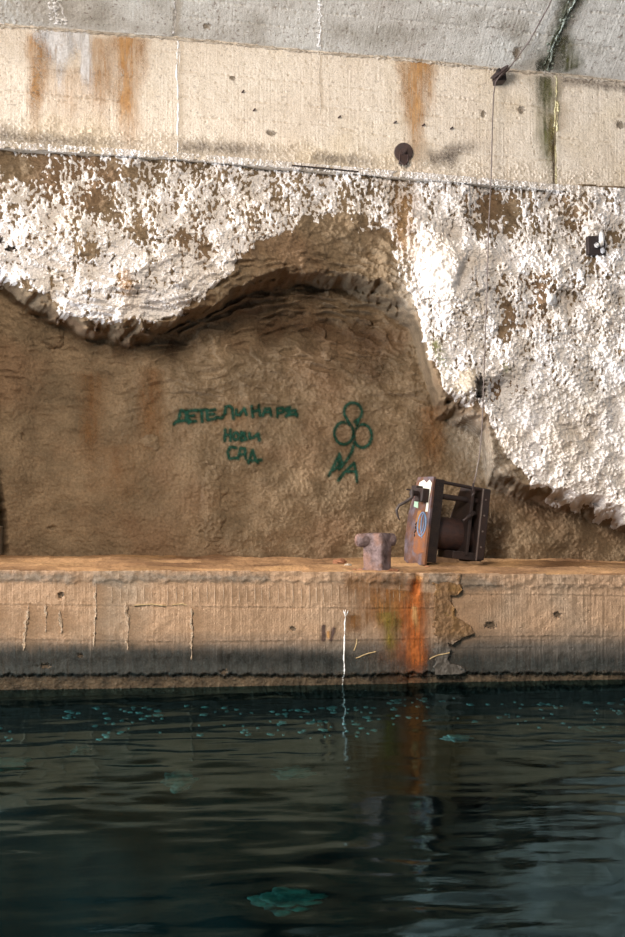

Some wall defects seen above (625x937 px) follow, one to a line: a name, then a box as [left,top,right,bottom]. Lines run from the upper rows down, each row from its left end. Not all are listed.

rust [30,35,52,106]
rust [117,37,135,115]
rust [408,62,431,134]
water stain [536,0,625,93]
water stain [0,132,625,530]
spalling [0,574,625,690]
rust [407,576,423,668]